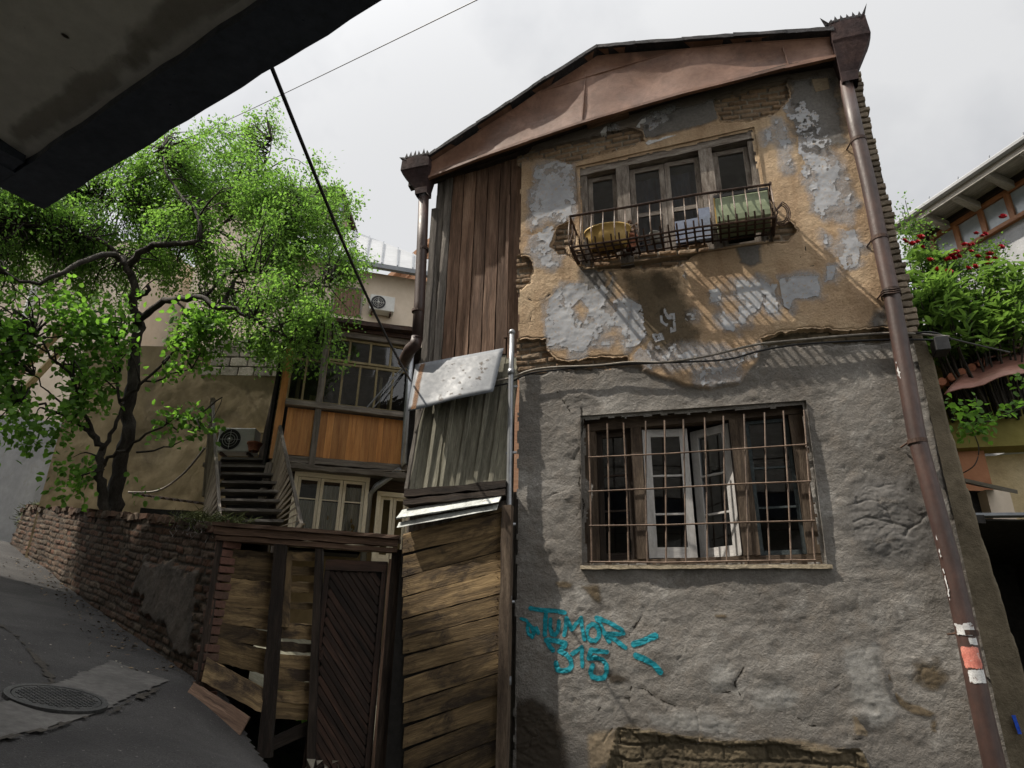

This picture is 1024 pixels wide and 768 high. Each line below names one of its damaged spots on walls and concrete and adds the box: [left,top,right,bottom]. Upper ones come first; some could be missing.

spalling [713,79,860,219]
spalling [516,109,727,294]
peeling [709,229,863,332]
peeling [516,283,725,387]
spalling [606,727,870,768]